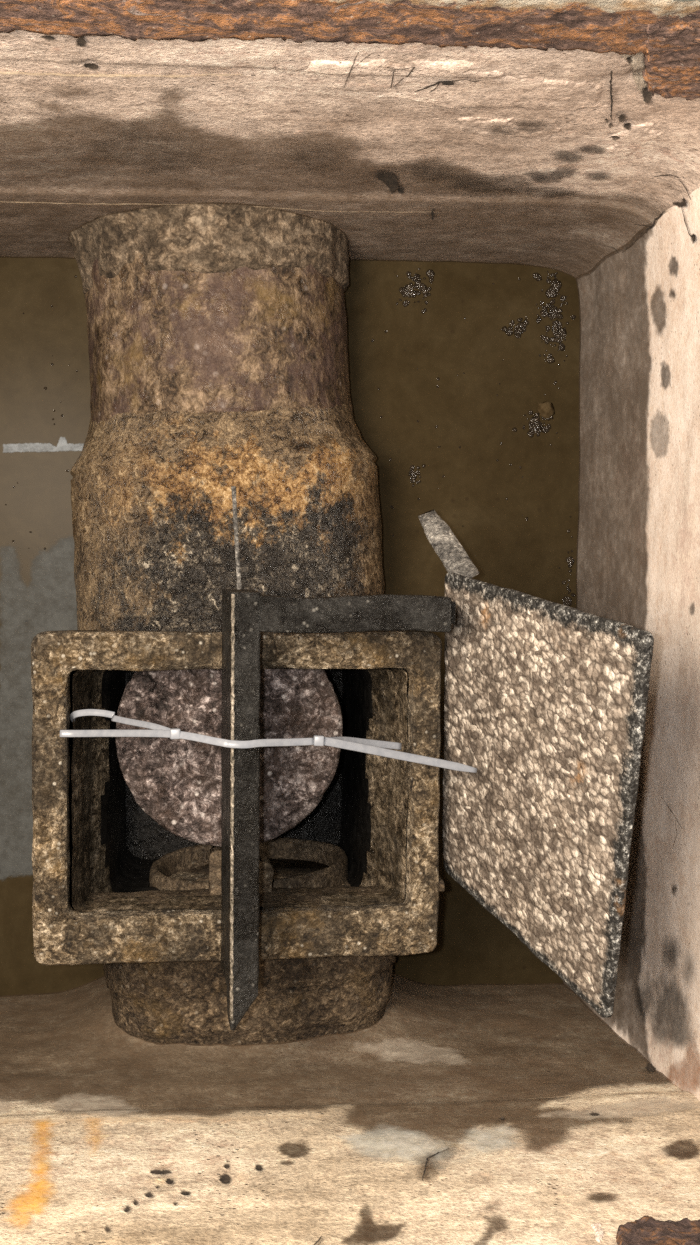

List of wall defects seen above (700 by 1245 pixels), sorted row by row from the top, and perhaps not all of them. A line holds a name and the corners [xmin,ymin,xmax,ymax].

leakage [0,115,675,630]
leakage [0,745,684,1178]
leakage [665,1140,699,1159]
leakage [589,1193,612,1201]
leakage [343,1207,403,1244]
leakage [479,1218,505,1245]